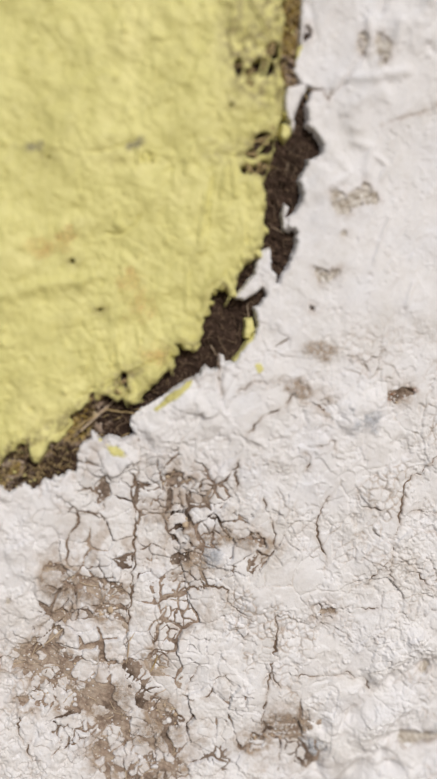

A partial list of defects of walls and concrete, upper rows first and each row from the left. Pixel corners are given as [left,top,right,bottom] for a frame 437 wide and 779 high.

peeling [330,183,378,215]
peeling [0,0,320,492]
spalling [164,506,195,566]
spalling [221,522,266,547]
crack [12,434,331,779]